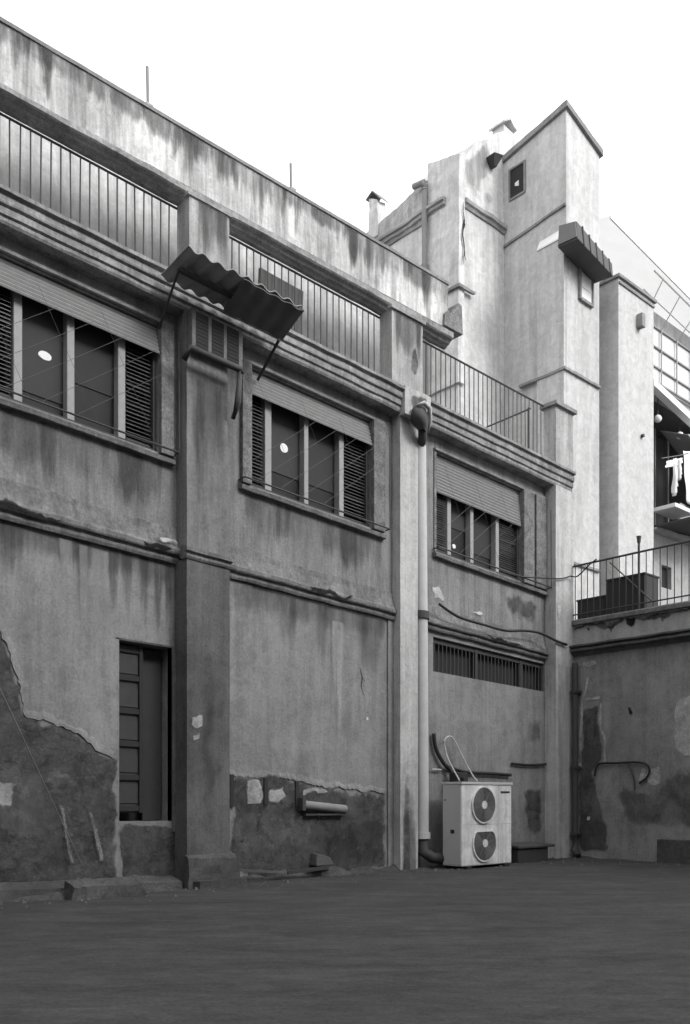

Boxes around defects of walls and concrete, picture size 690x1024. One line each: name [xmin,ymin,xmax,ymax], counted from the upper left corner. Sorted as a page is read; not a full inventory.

leakage [125,95,166,137]
leakage [318,209,331,228]
leakage [349,227,385,267]
crack [460,202,468,259]
leakage [508,598,535,617]
spalling [0,616,175,883]
spalling [230,770,386,877]